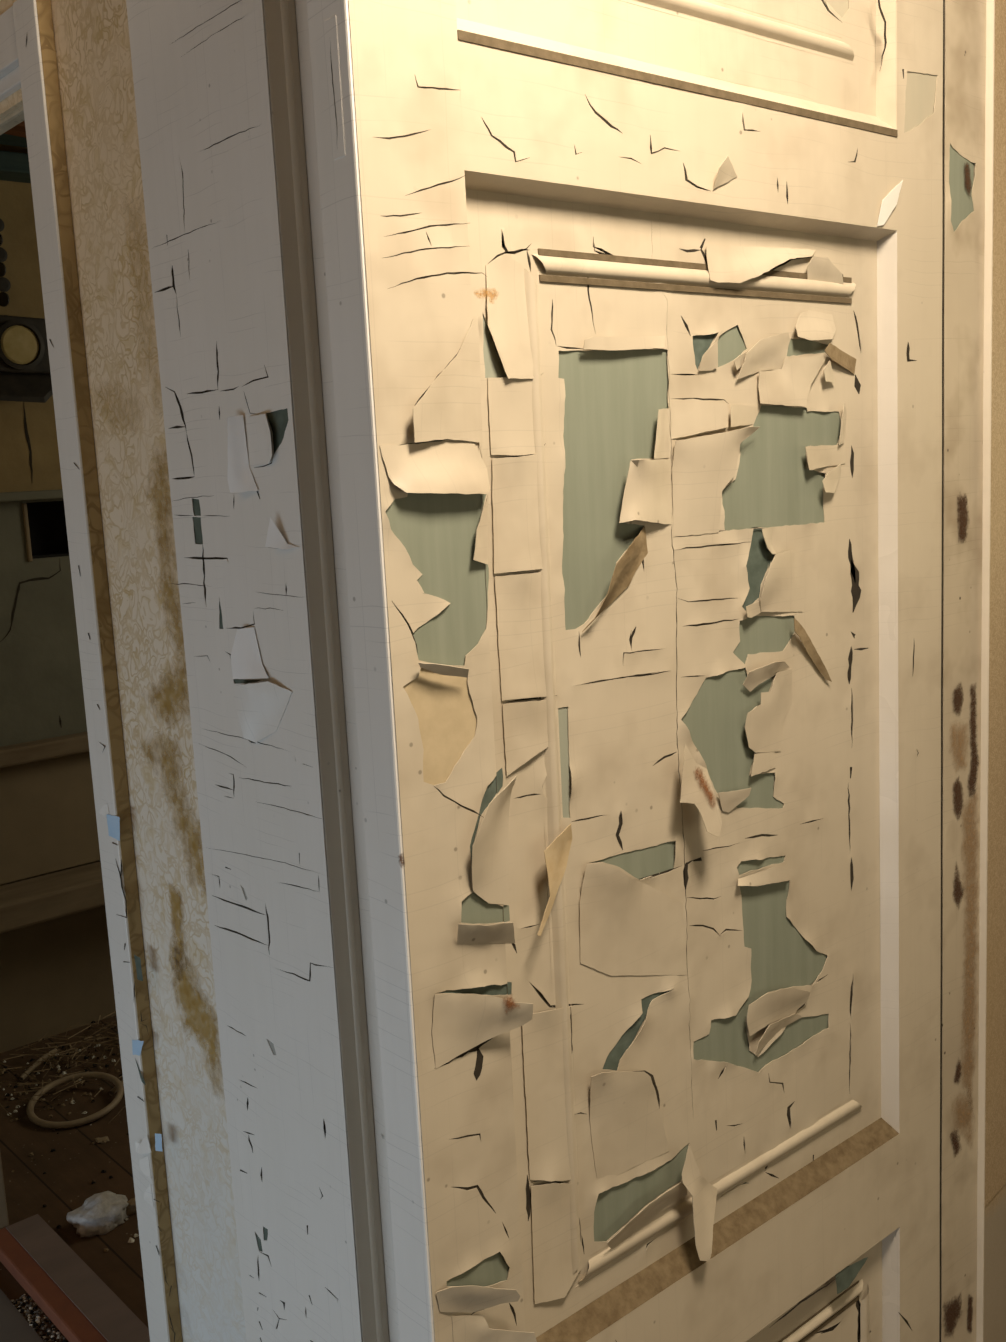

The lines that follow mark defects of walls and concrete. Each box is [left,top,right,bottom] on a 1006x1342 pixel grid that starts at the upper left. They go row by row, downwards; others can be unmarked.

crack [383,176,531,289]
crack [482,118,530,162]
crack [585,95,710,191]
peeling [706,246,844,285]
crack [166,344,273,604]
water stain [153,466,187,721]
peeling [231,627,292,743]
peeling [380,254,856,944]
water stain [147,742,206,890]
water stain [169,890,219,1085]
peeling [693,856,828,1072]
peeling [432,994,717,1342]